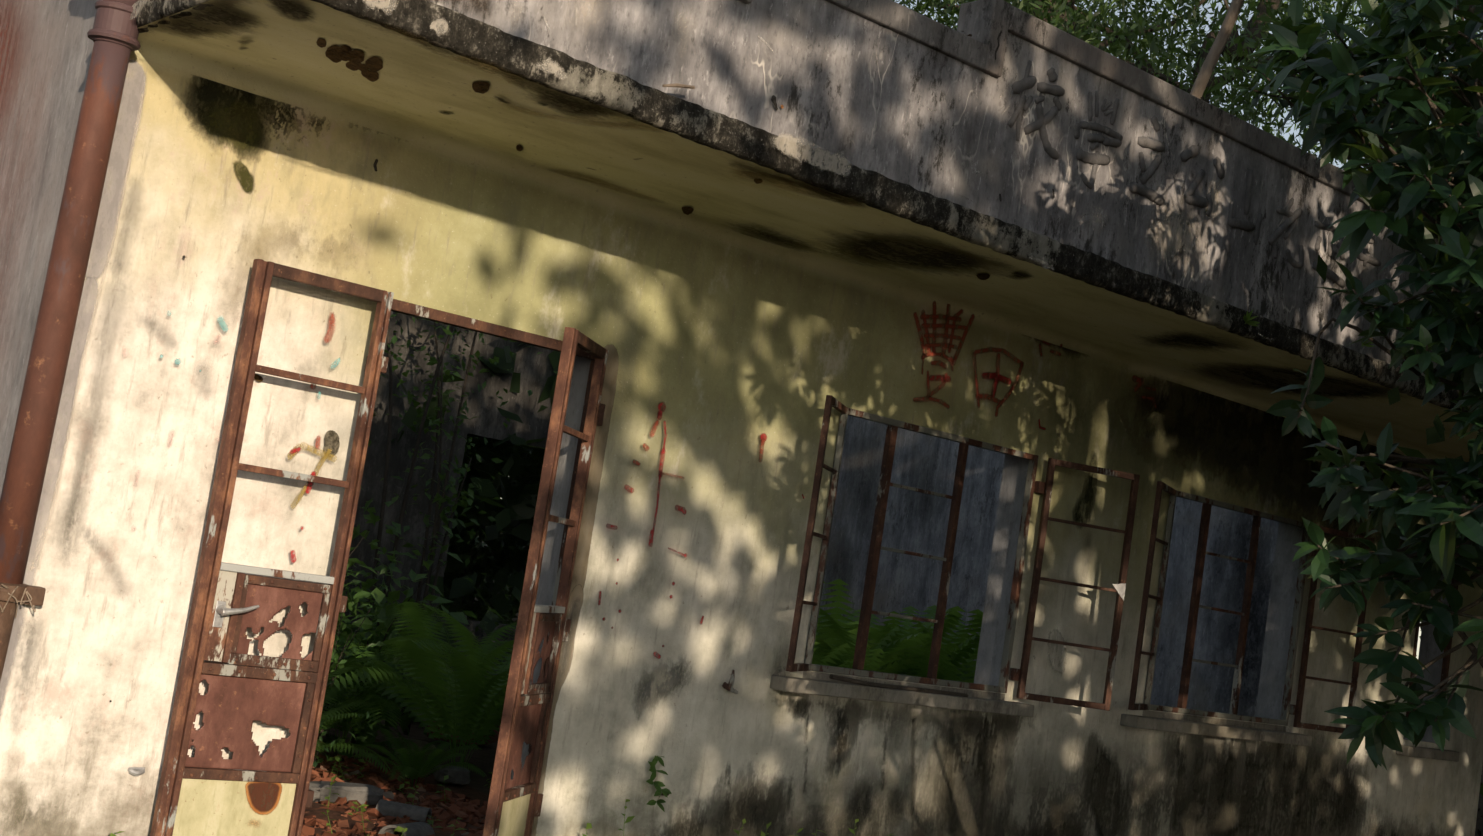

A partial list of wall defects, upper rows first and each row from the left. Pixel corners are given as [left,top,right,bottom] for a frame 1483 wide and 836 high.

damp [185,76,324,193]
damp [743,227,807,248]
damp [836,235,1031,279]
damp [638,664,684,705]
damp [663,712,1430,836]